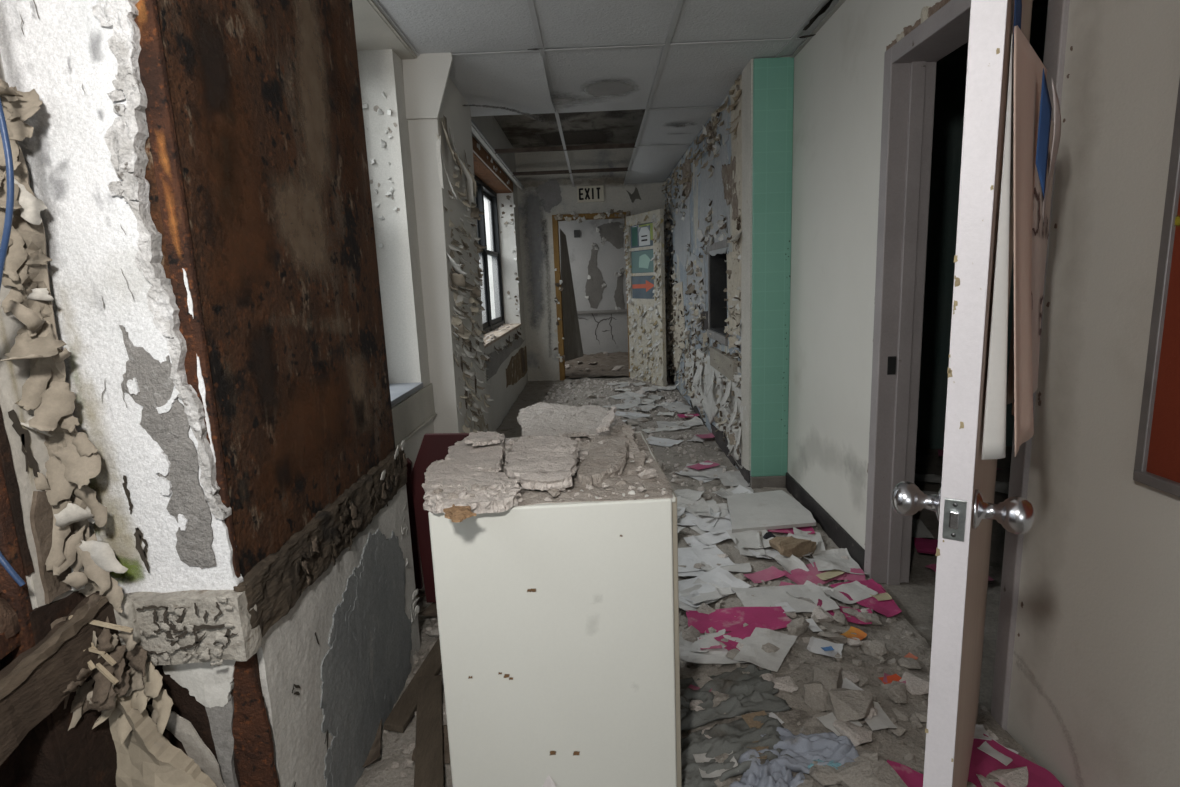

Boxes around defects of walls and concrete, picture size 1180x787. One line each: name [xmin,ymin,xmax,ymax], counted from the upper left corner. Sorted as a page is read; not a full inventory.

corrosion [158,137,169,172]
corrosion [165,189,179,251]
corrosion [276,0,330,270]
spalling [436,115,528,433]
peeling [534,59,754,487]
peeling [0,0,239,787]
corrosion [0,407,34,576]
crack [122,475,150,573]
crack [136,602,238,655]
peeling [295,441,437,787]
peeling [442,703,451,764]